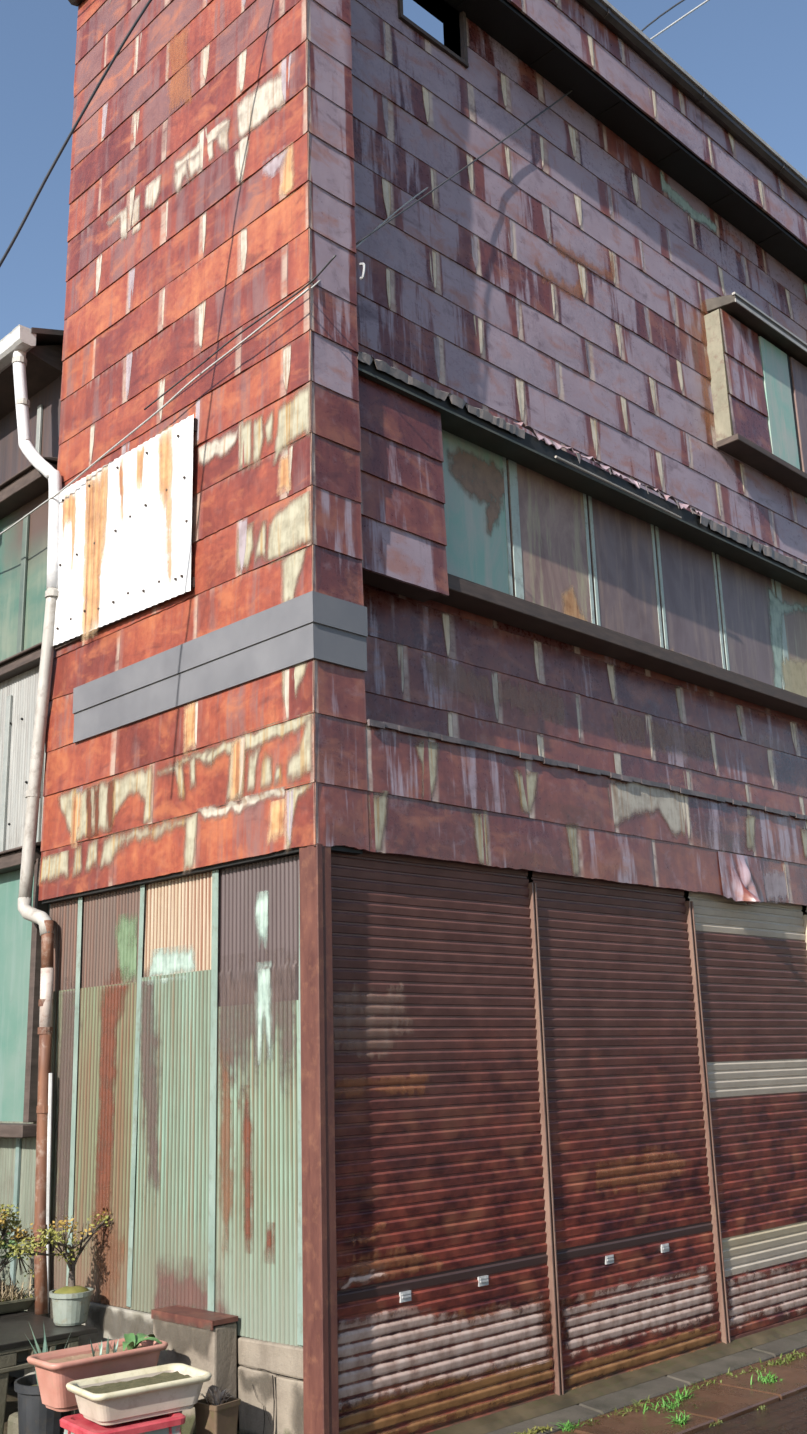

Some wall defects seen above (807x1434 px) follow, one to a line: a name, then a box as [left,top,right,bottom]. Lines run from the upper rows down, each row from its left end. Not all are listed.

peeling [107,75,284,239]
peeling [198,384,311,467]
corrosion [62,429,172,638]
peeling [237,491,311,602]
peeling [769,589,807,697]
peeling [38,711,312,883]
corrosion [56,988,75,1226]
corrosion [95,967,158,1305]
corrosion [155,1270,224,1313]
corrosion [218,959,297,1248]
corrosion [337,1222,441,1282]
corrosion [597,1149,685,1193]